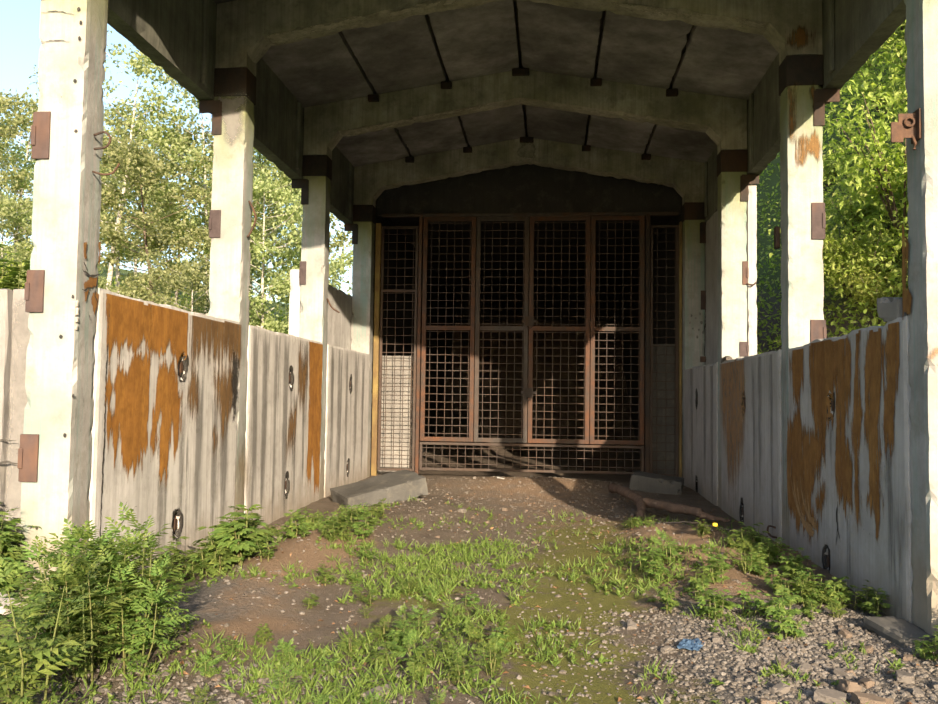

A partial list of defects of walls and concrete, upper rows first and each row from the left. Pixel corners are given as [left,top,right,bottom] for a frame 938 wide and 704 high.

corrosion [788,83,820,165]
corrosion [105,293,241,484]
corrosion [286,341,323,494]
corrosion [720,360,745,490]
corrosion [787,224,912,545]